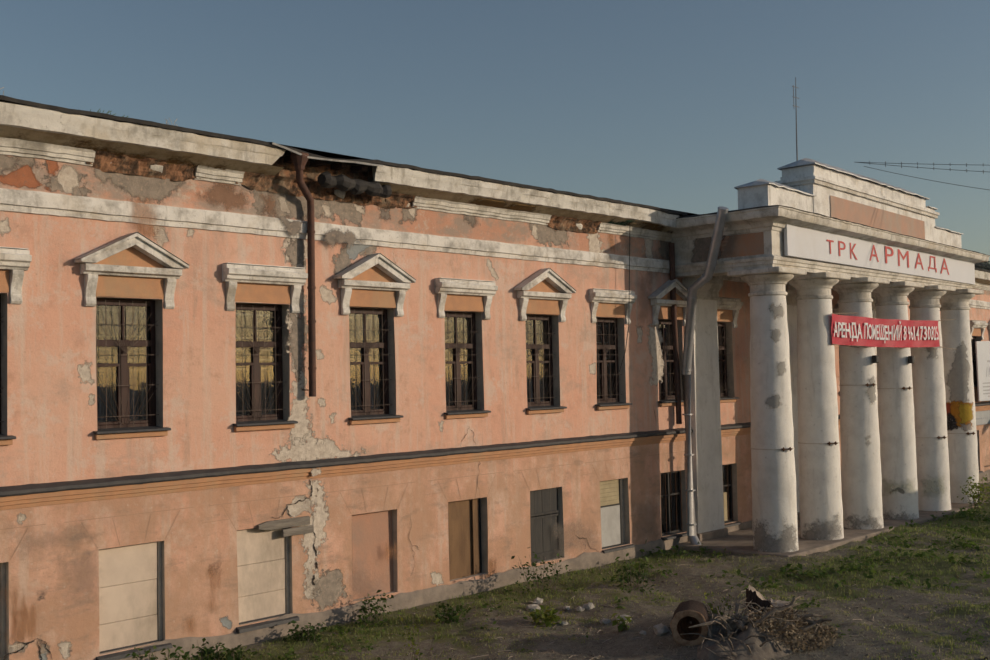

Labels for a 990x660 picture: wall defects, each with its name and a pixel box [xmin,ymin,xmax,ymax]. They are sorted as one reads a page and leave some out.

flaking render [0,149,201,204]
flaking render [236,154,420,274]
flaking render [769,304,784,343]
peeling [636,324,665,388]
flaking render [947,341,970,403]
flaking render [765,395,780,408]
peeling [272,284,366,611]
crack [3,638,52,660]
peeling [8,640,72,660]